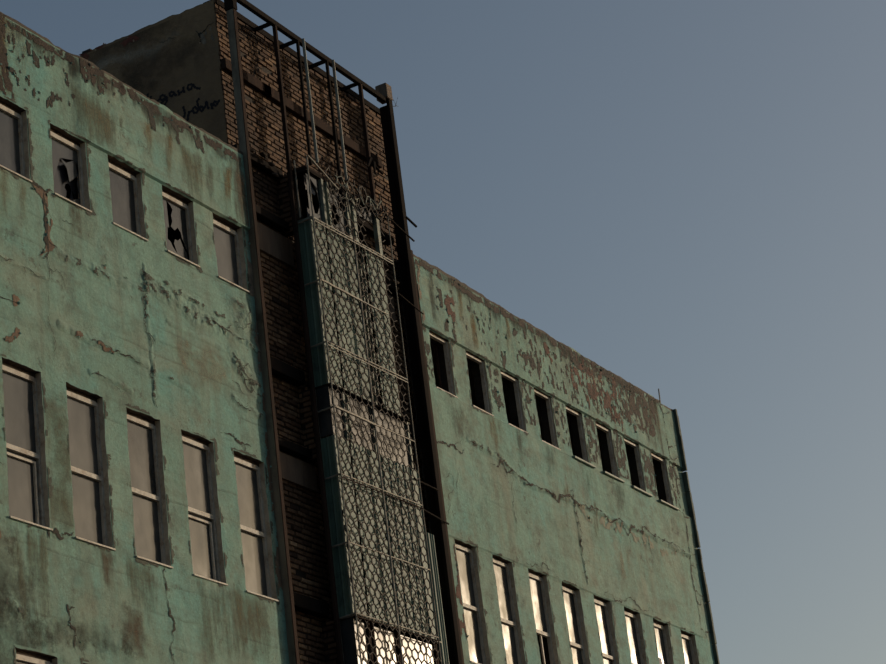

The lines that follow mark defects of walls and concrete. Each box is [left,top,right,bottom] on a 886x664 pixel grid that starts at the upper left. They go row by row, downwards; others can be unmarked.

peeling [0,13,241,163]
crack [1,181,73,364]
spalling [33,185,57,256]
crack [96,270,158,408]
crack [215,306,261,412]
peeling [415,259,684,511]
crack [438,400,711,642]
crack [163,569,176,664]